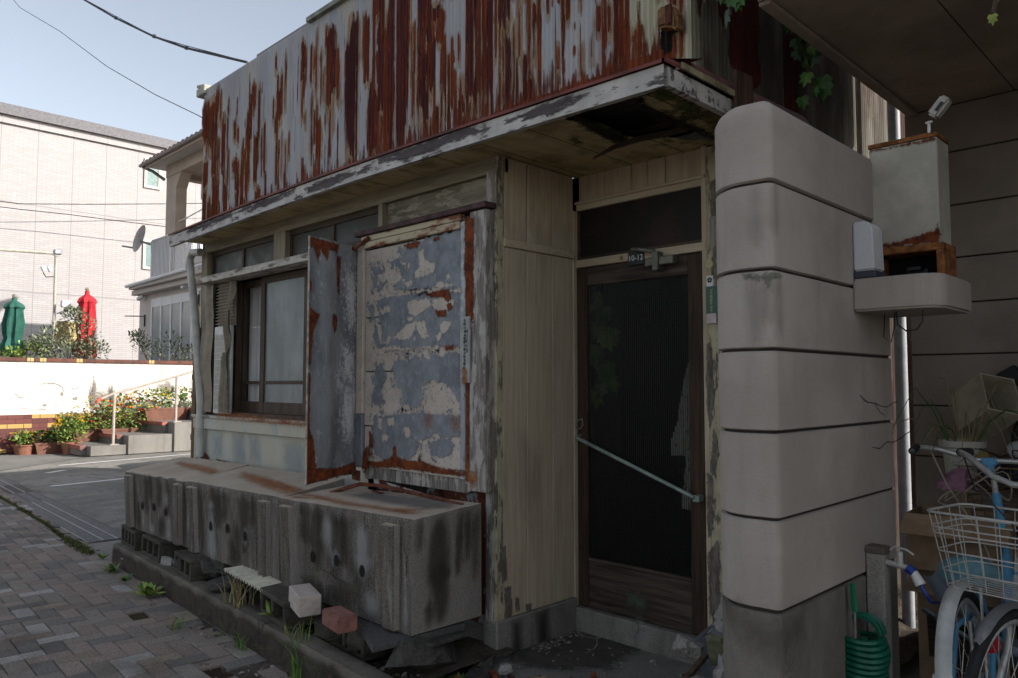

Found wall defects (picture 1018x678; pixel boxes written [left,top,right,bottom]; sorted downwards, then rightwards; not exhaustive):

corrosion [202,0,684,220]
corrosion [718,0,761,90]
corrosion [782,28,796,112]
corrosion [883,224,941,248]
peeling [331,229,461,463]
corrosion [426,289,452,317]
corrosion [217,304,477,513]
corrosion [178,452,227,473]
peeling [706,342,720,617]
leakage [301,506,368,604]
leakage [428,519,478,620]